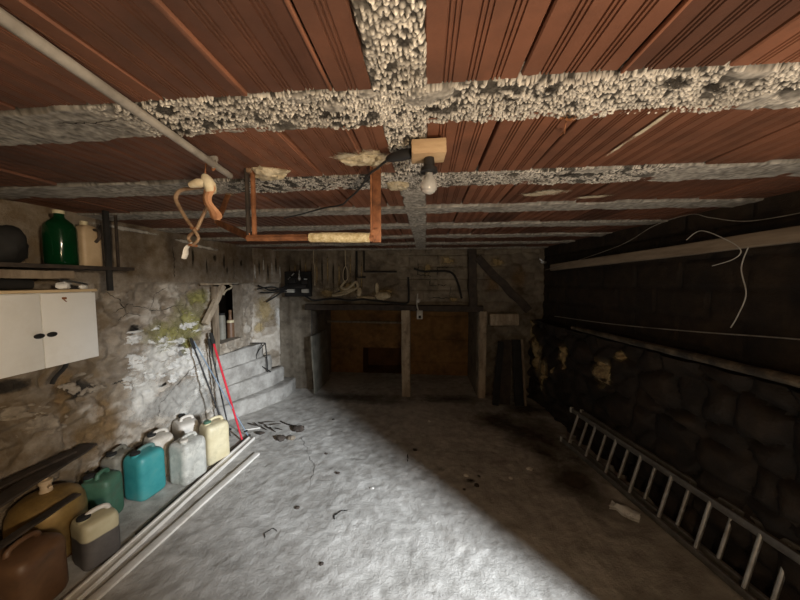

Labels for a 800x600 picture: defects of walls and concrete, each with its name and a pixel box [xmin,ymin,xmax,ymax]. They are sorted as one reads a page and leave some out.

peeling [122,321,205,393]